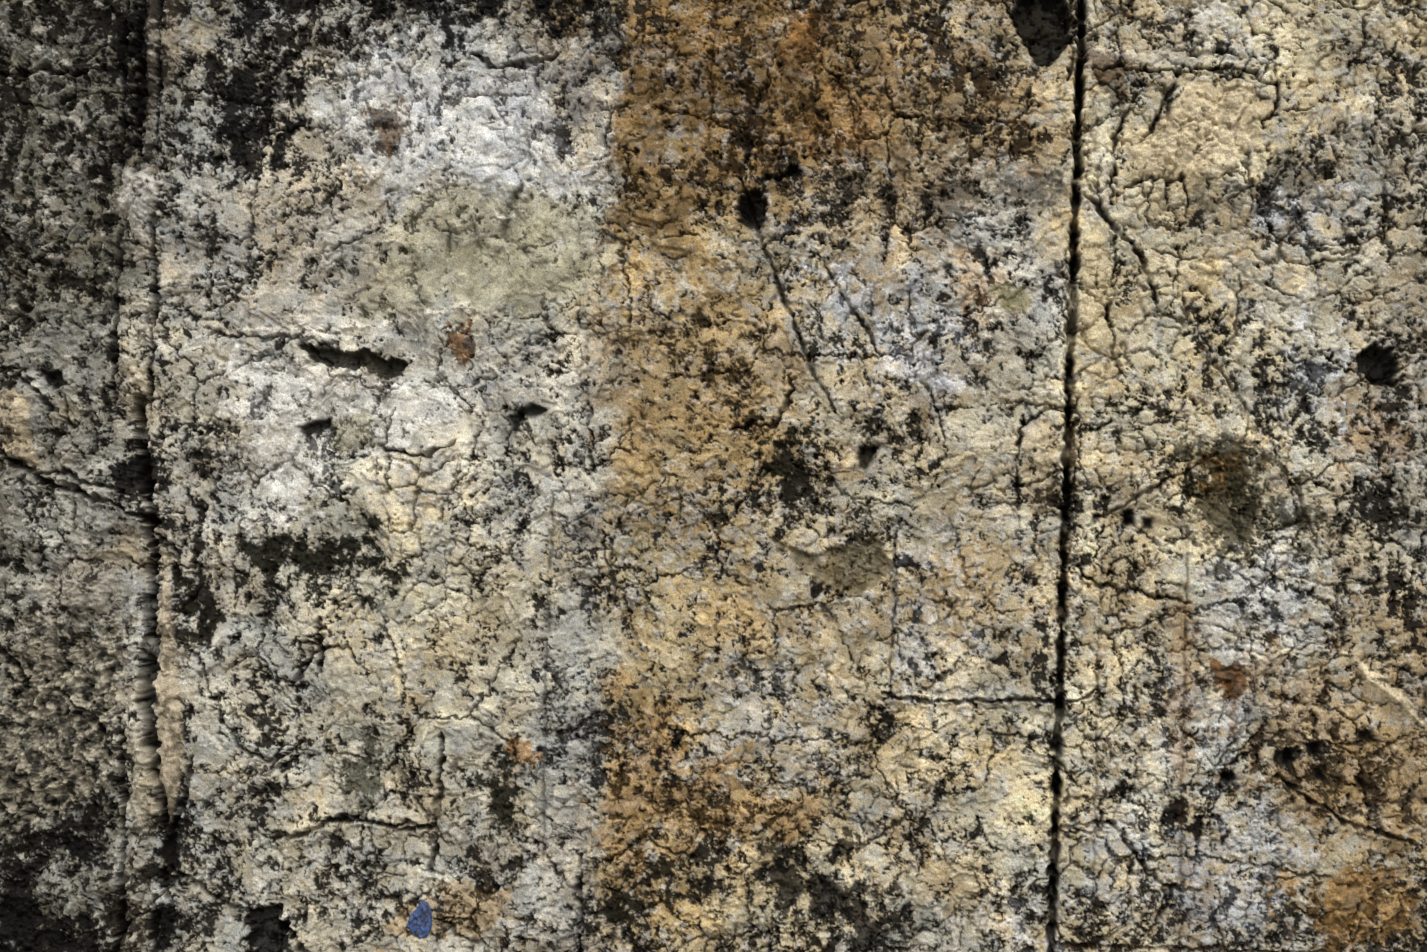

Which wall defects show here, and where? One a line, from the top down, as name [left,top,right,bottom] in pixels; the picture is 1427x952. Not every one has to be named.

rust [442,316,480,376]
crack [879,451,1328,952]
rust [1153,581,1427,952]
crack [1271,772,1422,848]